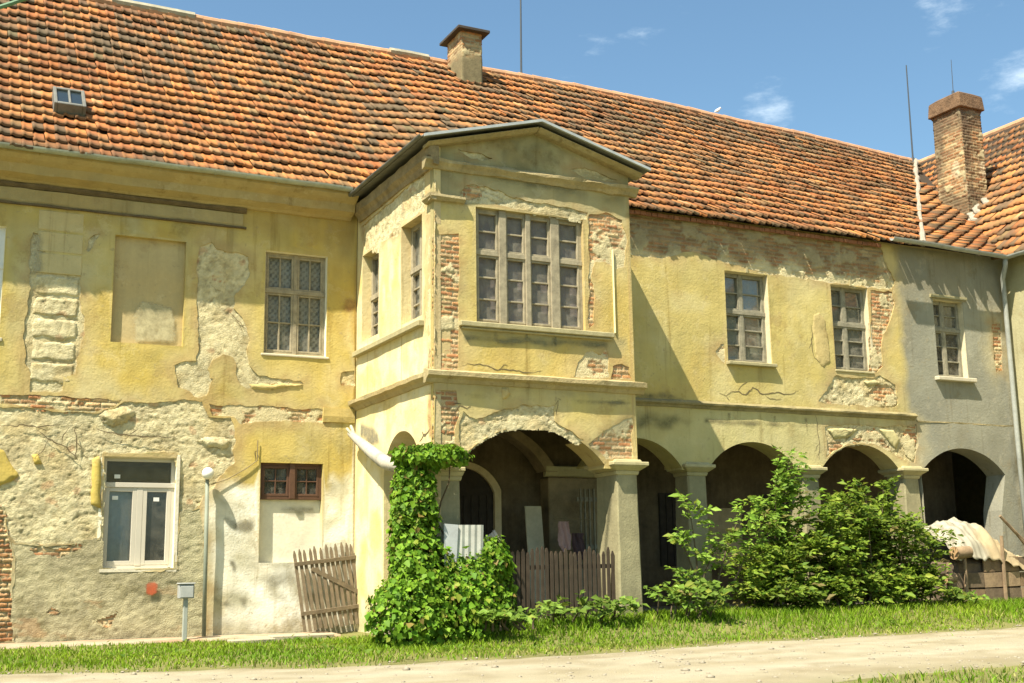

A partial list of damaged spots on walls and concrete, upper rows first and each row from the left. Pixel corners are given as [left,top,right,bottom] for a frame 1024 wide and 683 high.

flaking render [363,169,459,370]
flaking render [460,185,898,408]
peeling [0,233,326,643]
crack [464,363,538,373]
peeling [432,388,633,460]
crack [720,382,794,401]
peeling [825,424,918,462]
flaking render [992,321,1002,372]